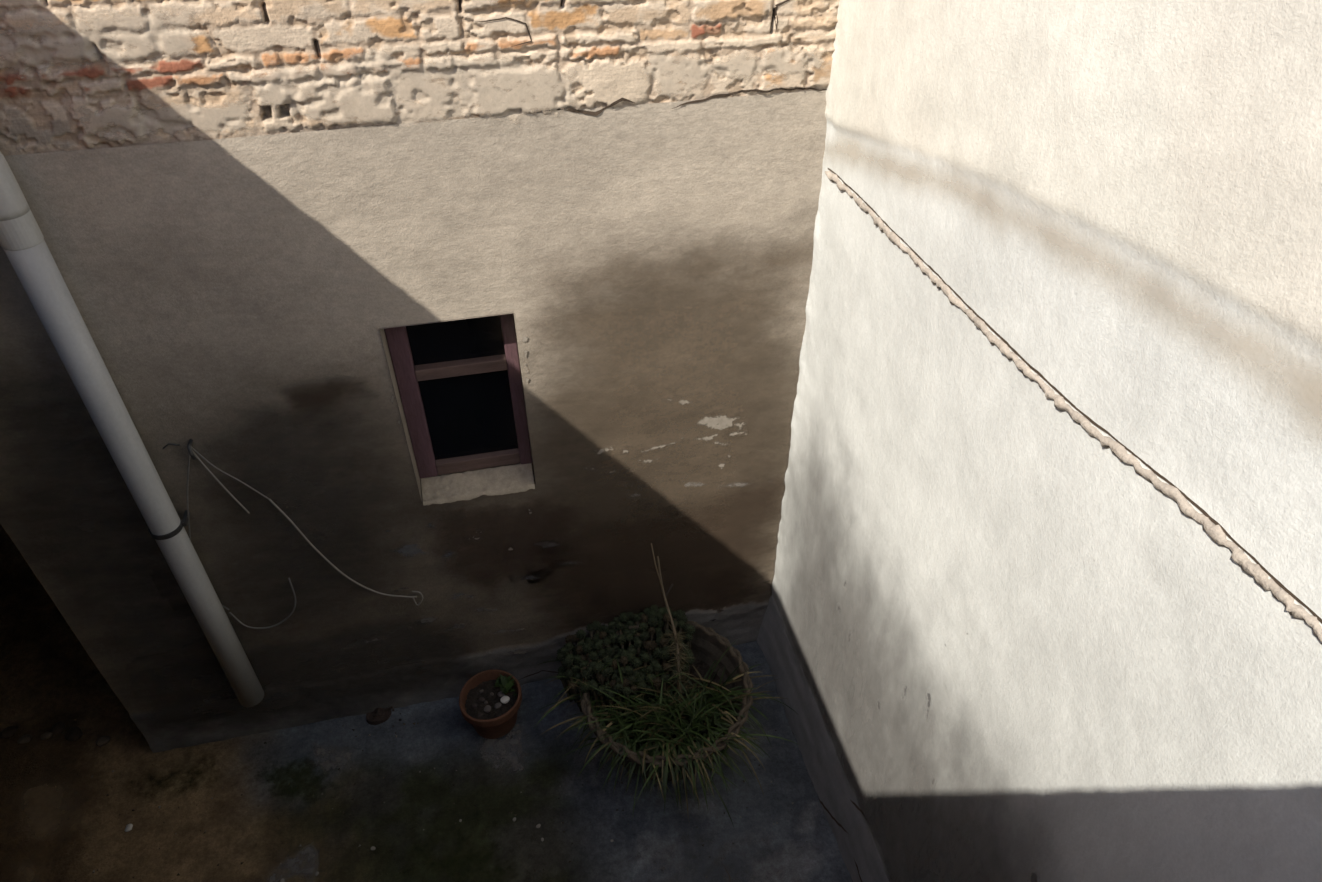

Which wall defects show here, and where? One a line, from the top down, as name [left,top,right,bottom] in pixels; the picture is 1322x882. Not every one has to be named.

crack [773,0,790,33]
peeling [80,50,575,141]
peeling [643,43,824,96]
water stain [429,250,810,629]
flaking render [586,415,747,470]
crack [828,168,1322,623]
water stain [221,383,387,614]
water stain [160,622,466,724]